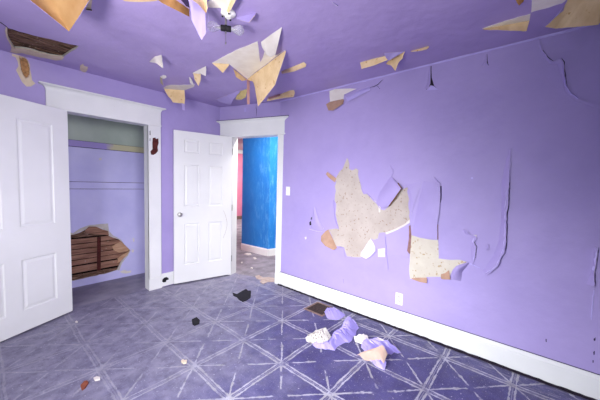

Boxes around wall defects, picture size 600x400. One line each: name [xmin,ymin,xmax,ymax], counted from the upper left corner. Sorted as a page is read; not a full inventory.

flaking render [483,0,566,29]
flaking render [5,27,64,87]
flaking render [213,41,285,79]
flaking render [330,88,355,102]
crack [424,66,439,90]
flaking render [329,159,410,258]
spalling [71,224,135,281]
flaking render [409,235,466,279]